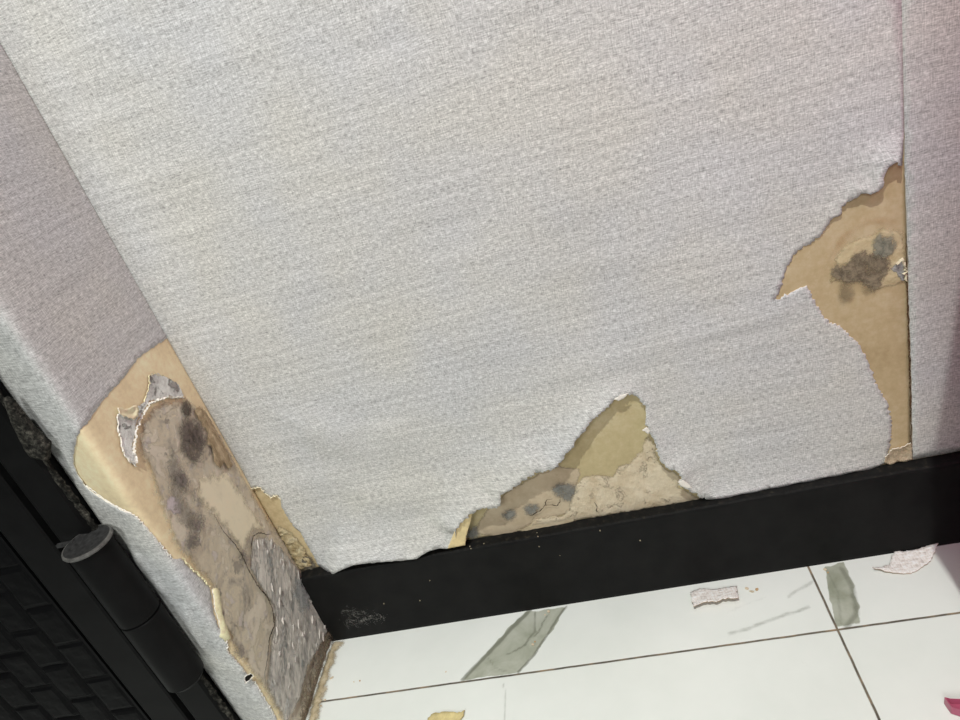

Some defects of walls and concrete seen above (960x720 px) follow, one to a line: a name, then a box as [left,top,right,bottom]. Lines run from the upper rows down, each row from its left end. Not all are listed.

water stain [831,234,897,300]
spalling [831,228,908,289]
water stain [167,400,207,550]
water stain [502,504,539,520]
water stain [552,483,575,501]
spalling [476,435,698,536]
spalling [116,373,328,720]